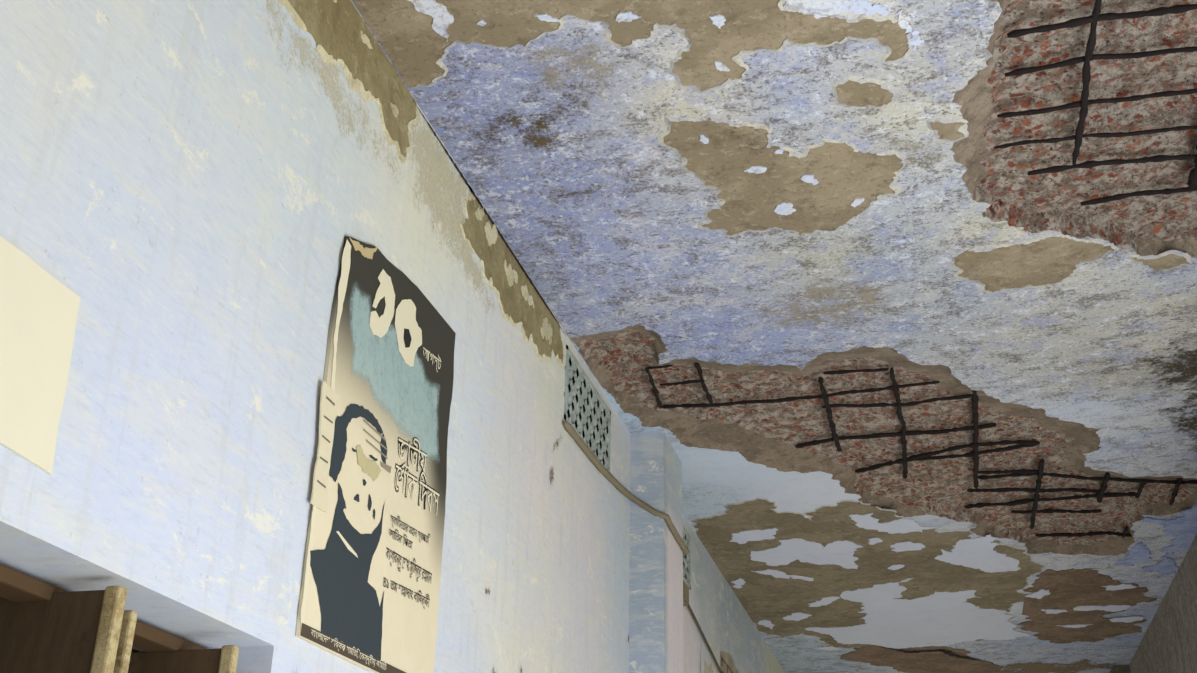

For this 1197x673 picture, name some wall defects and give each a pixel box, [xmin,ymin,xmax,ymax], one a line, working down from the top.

peeling [277,0,914,164]
peeling [658,113,907,237]
spalling [926,0,1197,293]
spalling [460,193,1197,673]
damp [1136,342,1197,451]